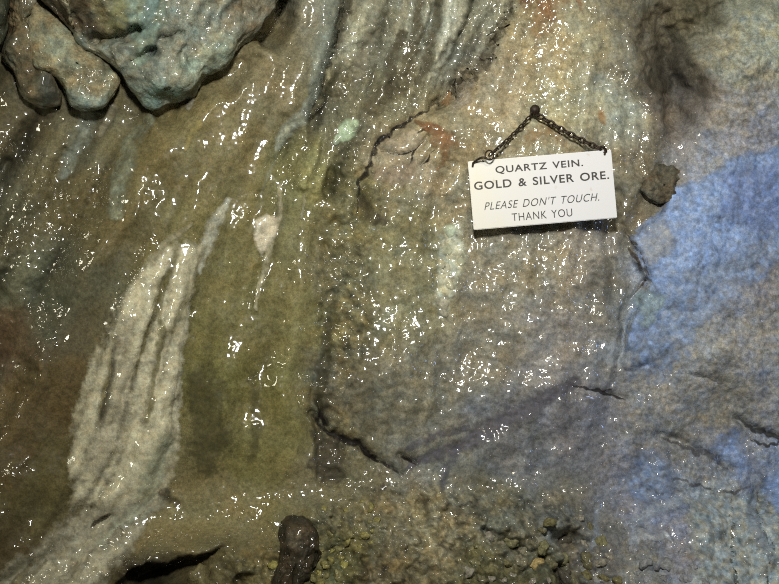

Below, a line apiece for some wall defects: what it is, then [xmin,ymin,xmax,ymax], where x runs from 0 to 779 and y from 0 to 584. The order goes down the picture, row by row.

crack [356,23,502,212]
crack [573,385,624,399]
crack [313,400,415,473]